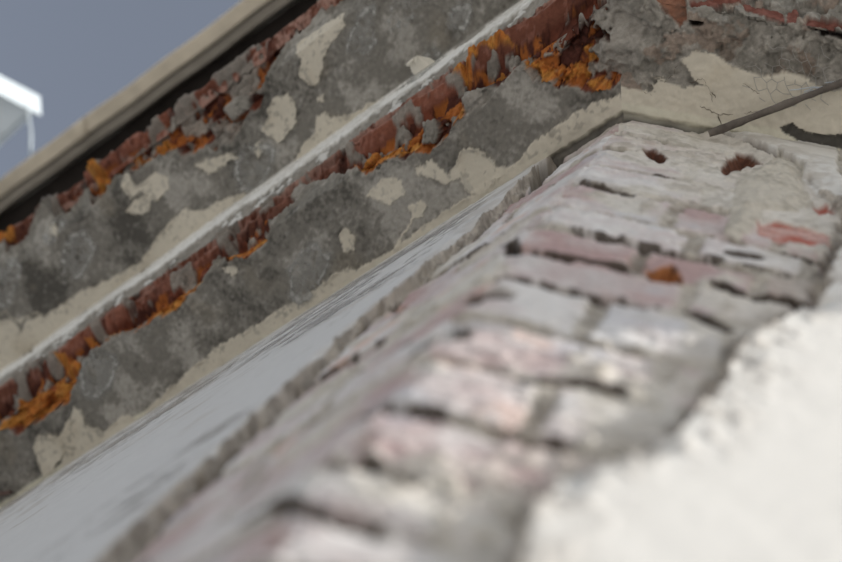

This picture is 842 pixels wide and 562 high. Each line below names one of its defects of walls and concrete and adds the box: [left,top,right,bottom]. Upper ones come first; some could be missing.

spalling [33,93,622,562]
spalling [0,0,842,436]
spalling [501,224,842,562]